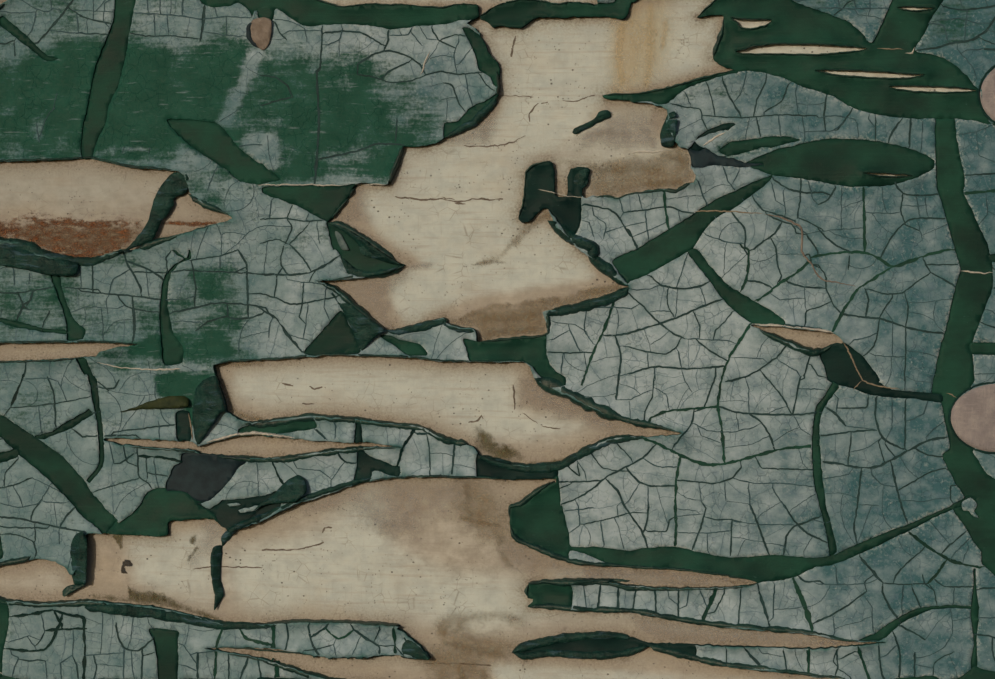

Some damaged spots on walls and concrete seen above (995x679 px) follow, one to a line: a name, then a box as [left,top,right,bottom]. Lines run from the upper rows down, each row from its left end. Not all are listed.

crack [0,0,252,159]
rust [0,217,137,257]
peeling [0,156,232,276]
peeling [200,0,995,352]
crack [0,119,341,559]
crack [271,0,995,679]
crack [195,526,332,569]
peeling [0,311,976,679]
crack [0,599,491,679]
peeling [954,665,995,679]